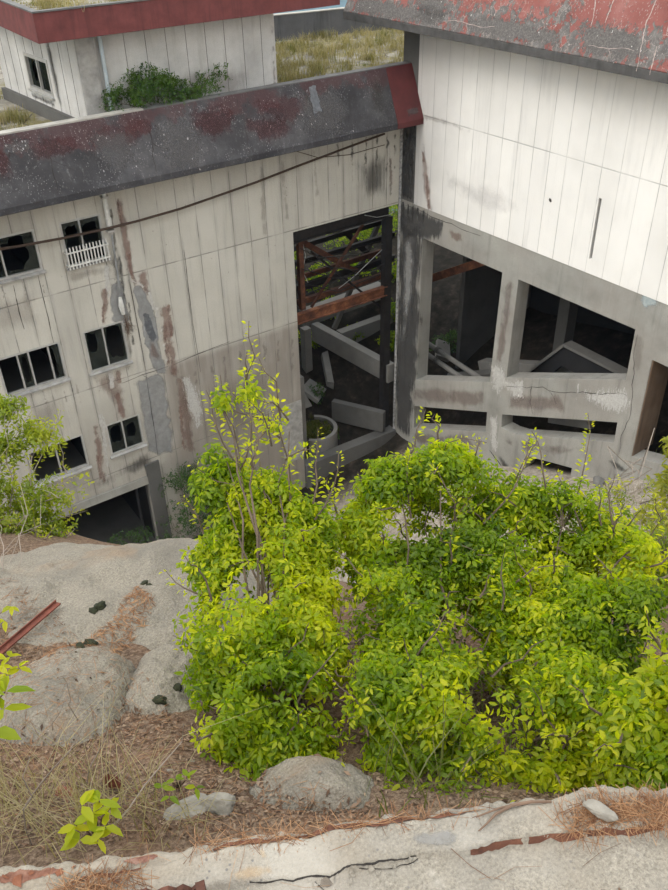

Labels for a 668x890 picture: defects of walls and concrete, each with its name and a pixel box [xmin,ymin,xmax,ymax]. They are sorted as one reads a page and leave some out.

peeling [353,0,451,27]
peeling [465,15,563,49]
peeling [578,18,644,65]
crack [590,0,668,72]
corrosion [118,203,147,291]
leakage [366,126,443,434]
corrosion [162,305,176,374]
crack [508,338,637,452]
peeling [576,384,631,414]
corrosion [94,427,105,480]
crack [250,855,418,890]